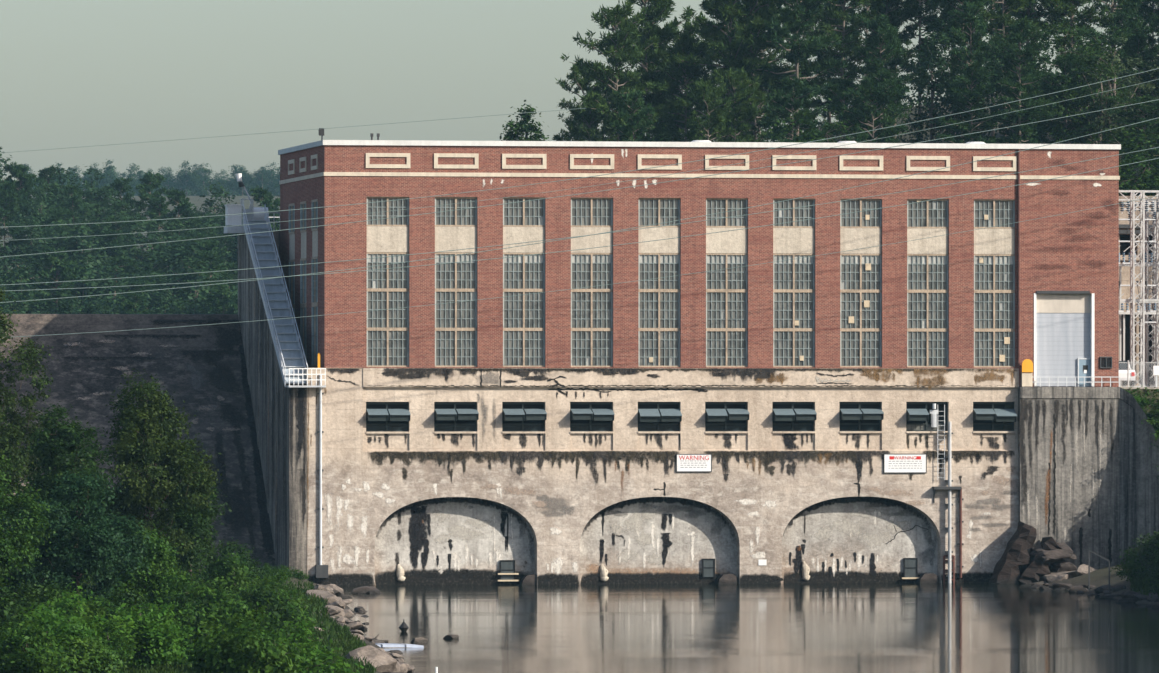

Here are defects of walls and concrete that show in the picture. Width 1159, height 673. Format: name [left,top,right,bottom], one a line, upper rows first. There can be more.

spalling [816,373,854,384]
water stain [104,299,981,584]
water stain [906,400,1114,539]
water stain [307,479,735,586]
water stain [941,551,993,583]